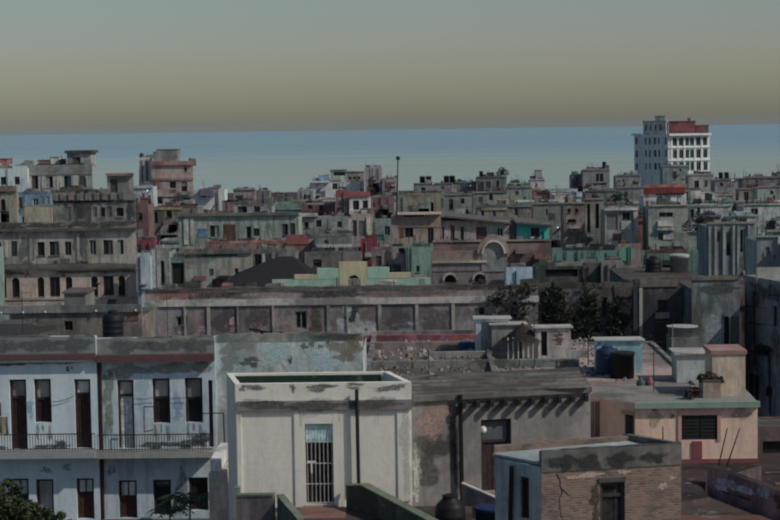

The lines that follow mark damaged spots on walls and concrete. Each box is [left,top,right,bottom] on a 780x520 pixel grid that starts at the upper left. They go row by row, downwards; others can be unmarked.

water stain [0,325,92,366]
water stain [415,404,460,489]